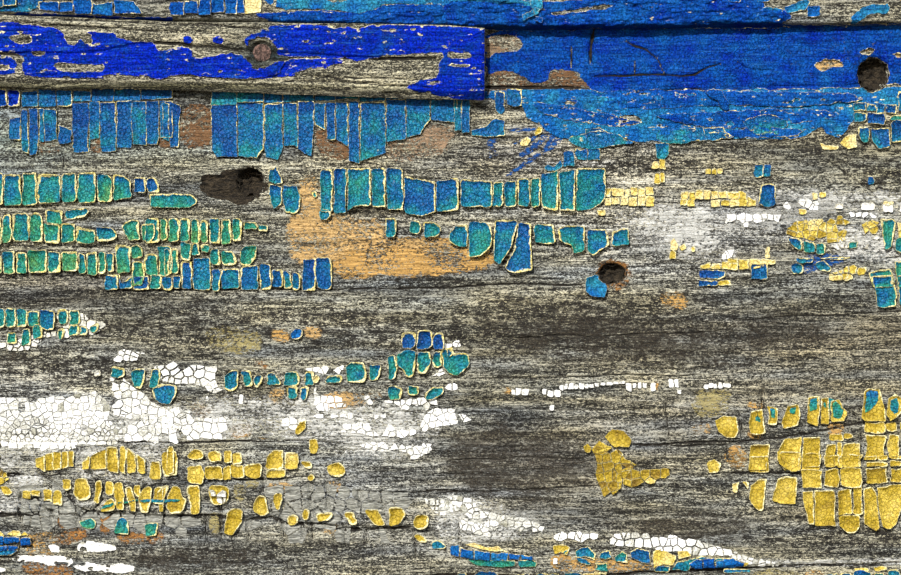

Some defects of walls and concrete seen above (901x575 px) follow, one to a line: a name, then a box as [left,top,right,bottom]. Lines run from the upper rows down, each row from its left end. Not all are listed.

peeling [0,0,901,273]
peeling [0,308,106,351]
peeling [0,172,332,291]
peeling [291,328,303,340]
peeling [585,275,607,297]
peeling [680,164,901,308]
peeling [732,388,901,533]
peeling [826,566,900,575]